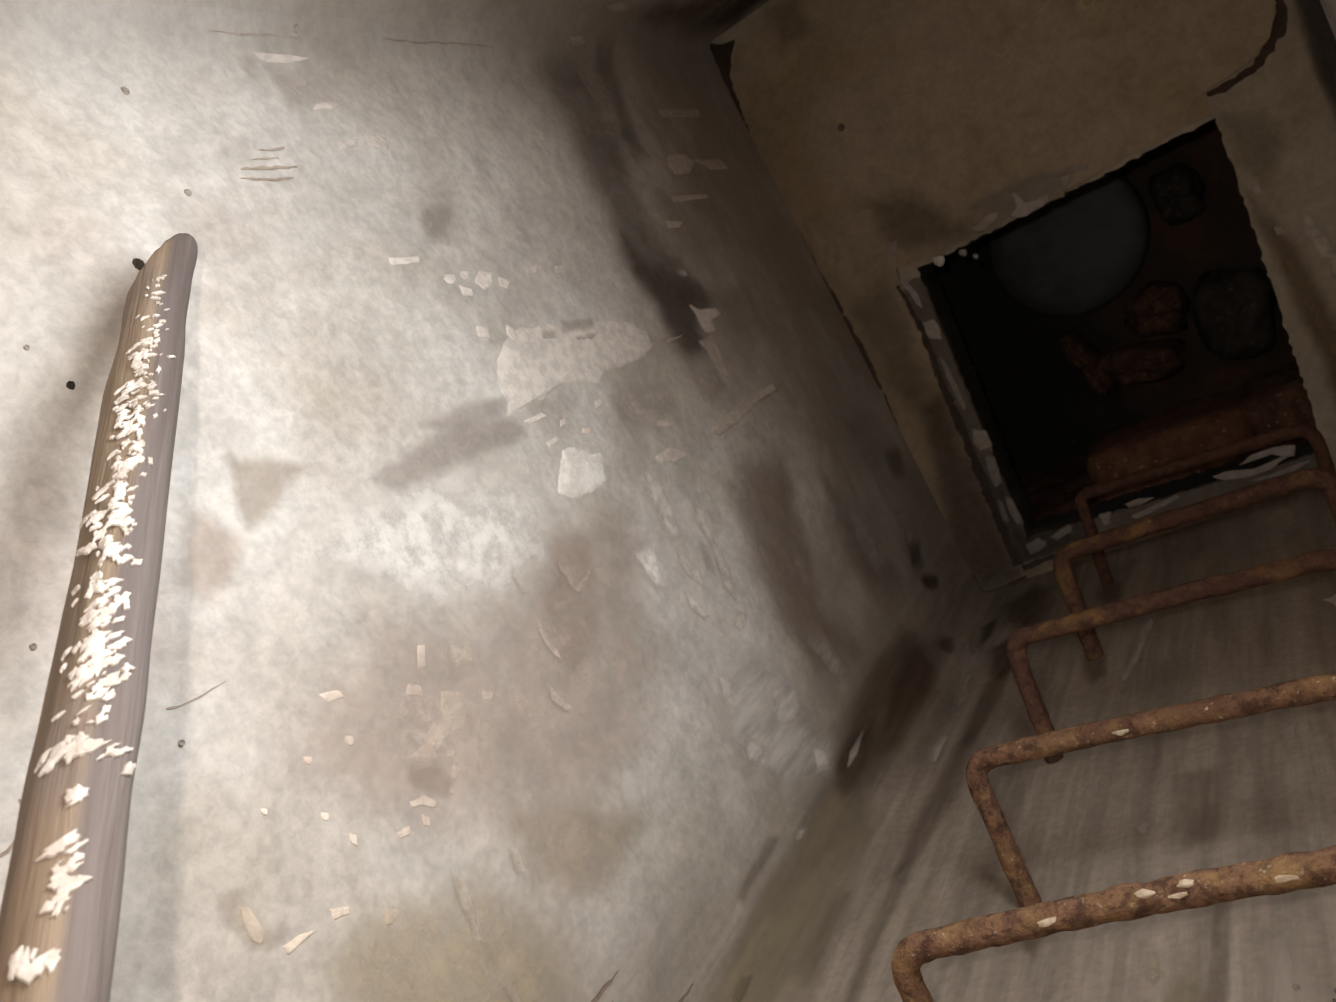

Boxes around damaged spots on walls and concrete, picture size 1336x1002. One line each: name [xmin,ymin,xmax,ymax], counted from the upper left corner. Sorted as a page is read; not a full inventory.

flaking render [476,296,758,498]
peeling [34,258,176,778]
peeling [417,644,426,668]
peeling [319,690,345,703]
peeling [407,691,466,795]
peeling [64,784,90,809]
peeling [397,795,436,839]
peeling [36,829,94,919]
flaking render [282,930,315,954]
peeling [8,945,62,986]
crack [591,970,619,1002]
crack [679,983,694,1002]